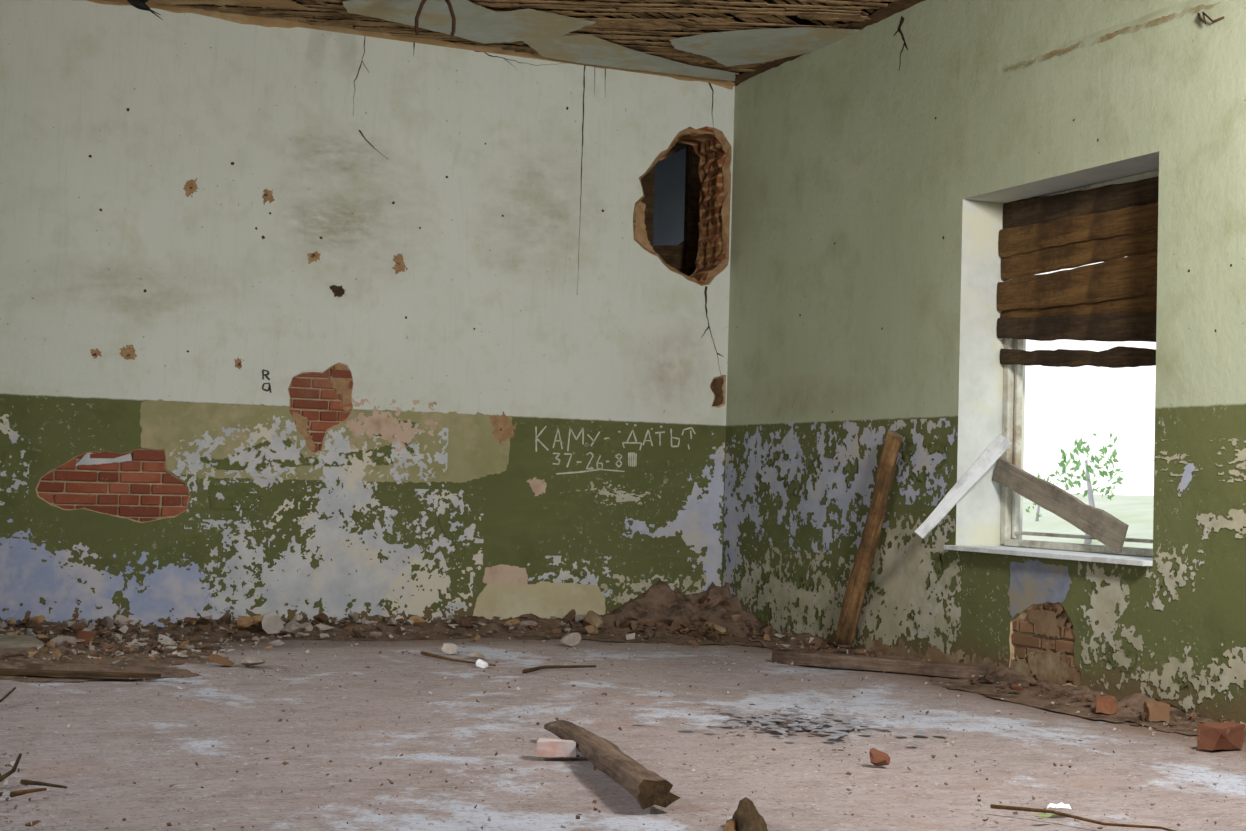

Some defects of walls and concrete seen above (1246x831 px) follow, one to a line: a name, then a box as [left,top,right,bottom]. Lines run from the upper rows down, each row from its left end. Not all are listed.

flaking render [86,0,803,90]
flaking render [837,0,925,30]
spalling [633,126,732,286]
peeling [0,362,484,627]
flaking render [490,411,517,446]
peeling [526,411,1246,724]